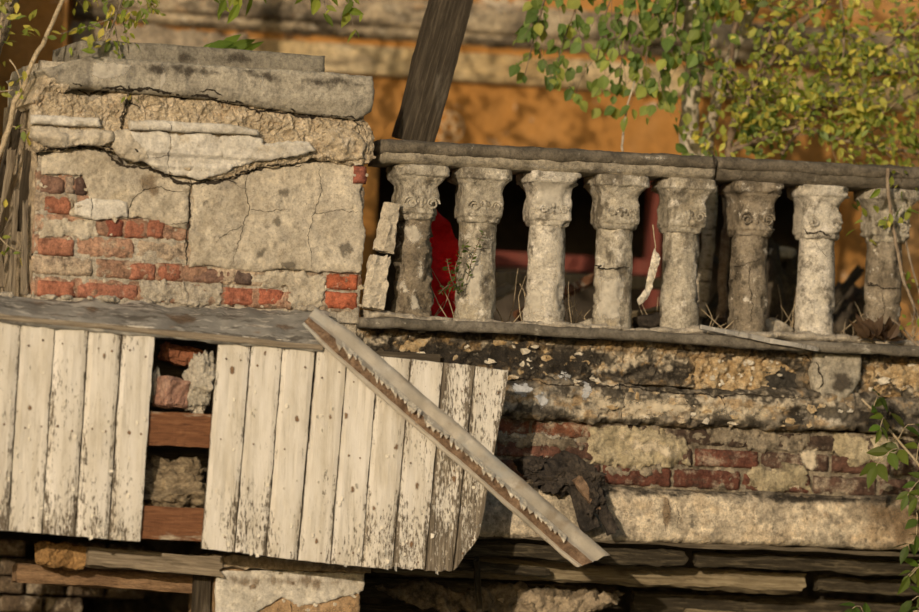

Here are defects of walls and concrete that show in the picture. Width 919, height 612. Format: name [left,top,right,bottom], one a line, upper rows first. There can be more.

spalling [39,171,88,215]
crack [33,83,367,270]
spalling [34,231,74,259]
spalling [105,215,171,244]
spalling [37,256,184,303]
spalling [193,265,288,308]
leakage [383,338,608,381]